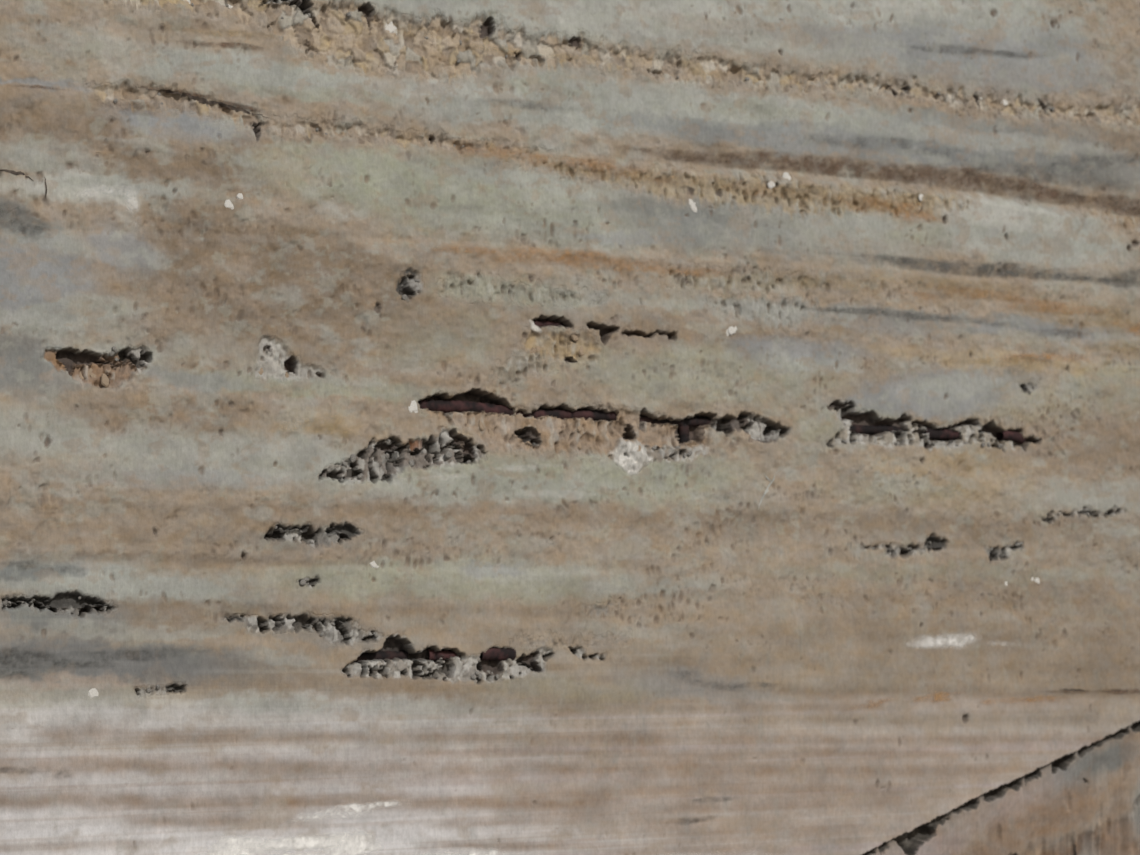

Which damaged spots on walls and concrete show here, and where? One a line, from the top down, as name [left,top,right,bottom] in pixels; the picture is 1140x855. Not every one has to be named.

spalling [41,312,153,392]
spalling [254,335,325,383]
spalling [408,268,793,477]
spalling [825,400,1043,481]
spalling [340,632,607,686]